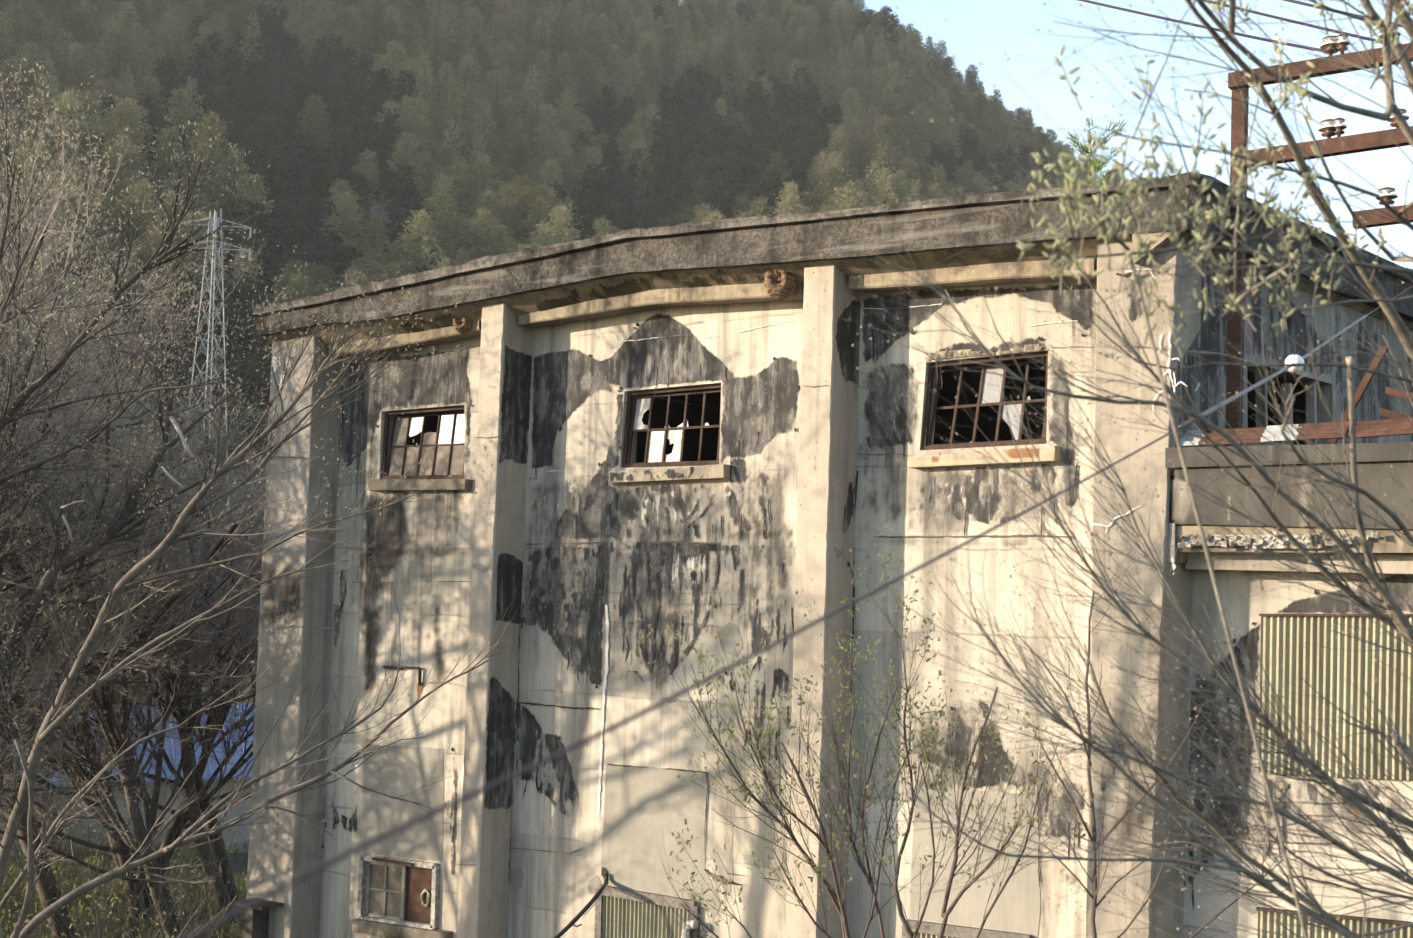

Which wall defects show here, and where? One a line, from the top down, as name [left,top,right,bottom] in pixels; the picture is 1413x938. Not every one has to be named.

damp [353,389,465,689]
damp [871,373,901,519]
damp [924,468,983,529]
spalling [1178,531,1379,552]
damp [534,473,792,820]